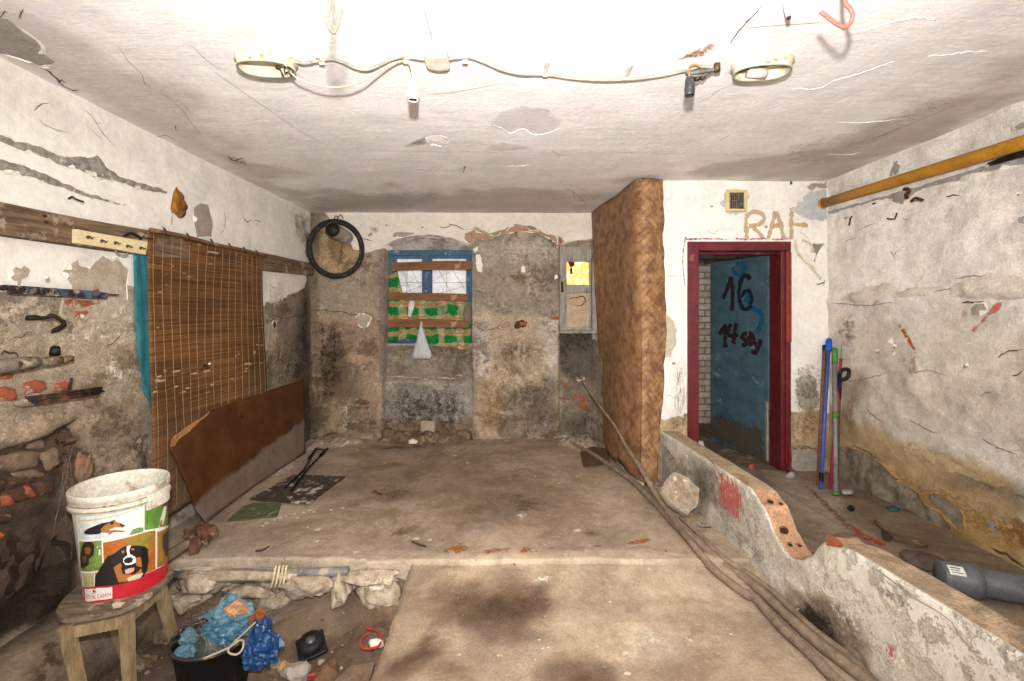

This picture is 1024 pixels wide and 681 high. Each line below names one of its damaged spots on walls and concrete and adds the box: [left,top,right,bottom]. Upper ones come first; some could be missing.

peeling [0,17,54,68]
crack [791,61,895,90]
spalling [0,132,167,207]
peeling [792,157,1024,223]
spalling [464,225,564,272]
peeling [43,254,129,323]
damp [320,322,355,397]
damp [393,387,461,427]
flaking render [0,427,73,600]